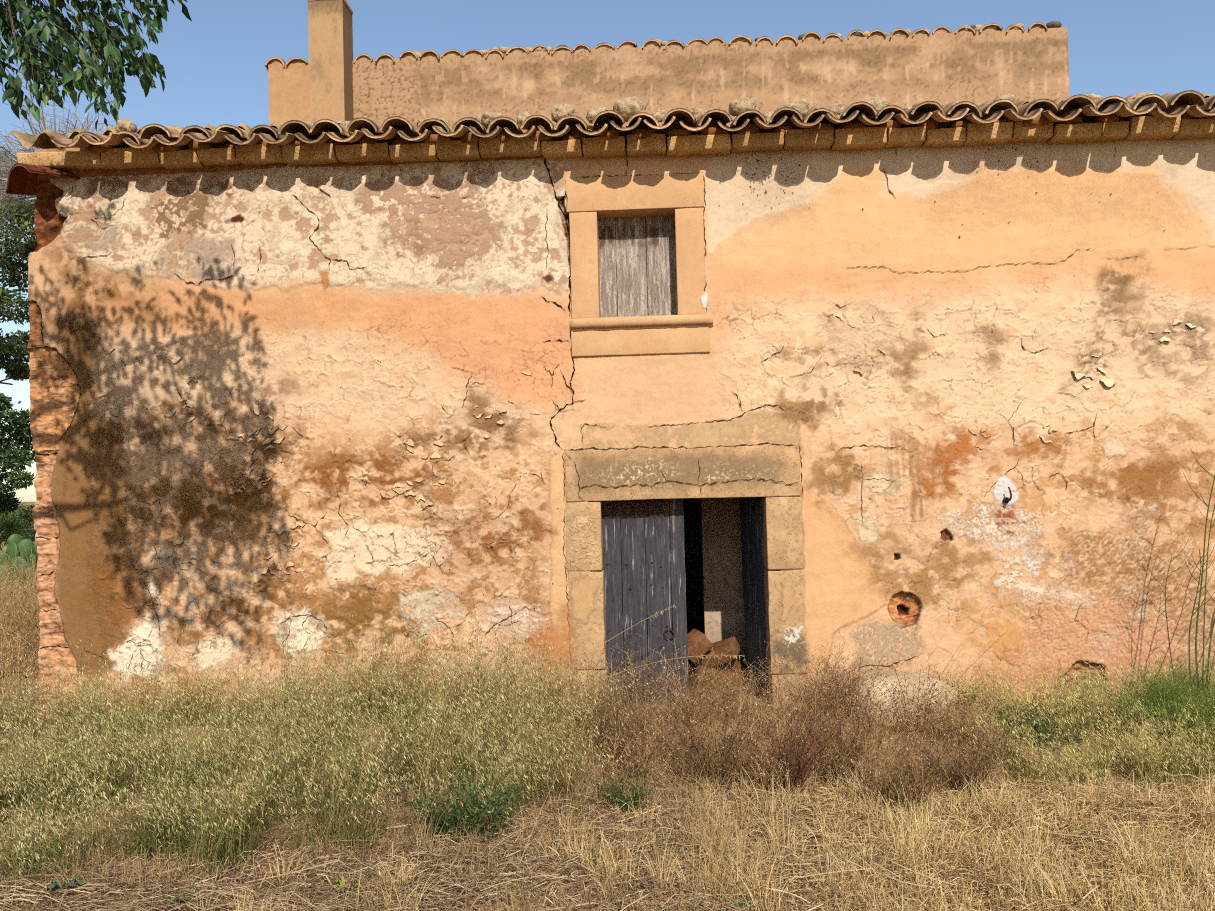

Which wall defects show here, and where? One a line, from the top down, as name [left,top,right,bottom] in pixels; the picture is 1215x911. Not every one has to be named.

spalling [34,181,66,252]
crack [175,246,262,284]
crack [294,184,364,270]
crack [842,248,1138,273]
crack [471,156,803,666]
spalling [27,301,80,703]
water stain [84,419,152,649]
peeling [108,573,167,682]
peeling [317,517,454,585]
crack [405,606,535,642]
spalling [888,592,921,629]
peeling [939,476,1150,700]